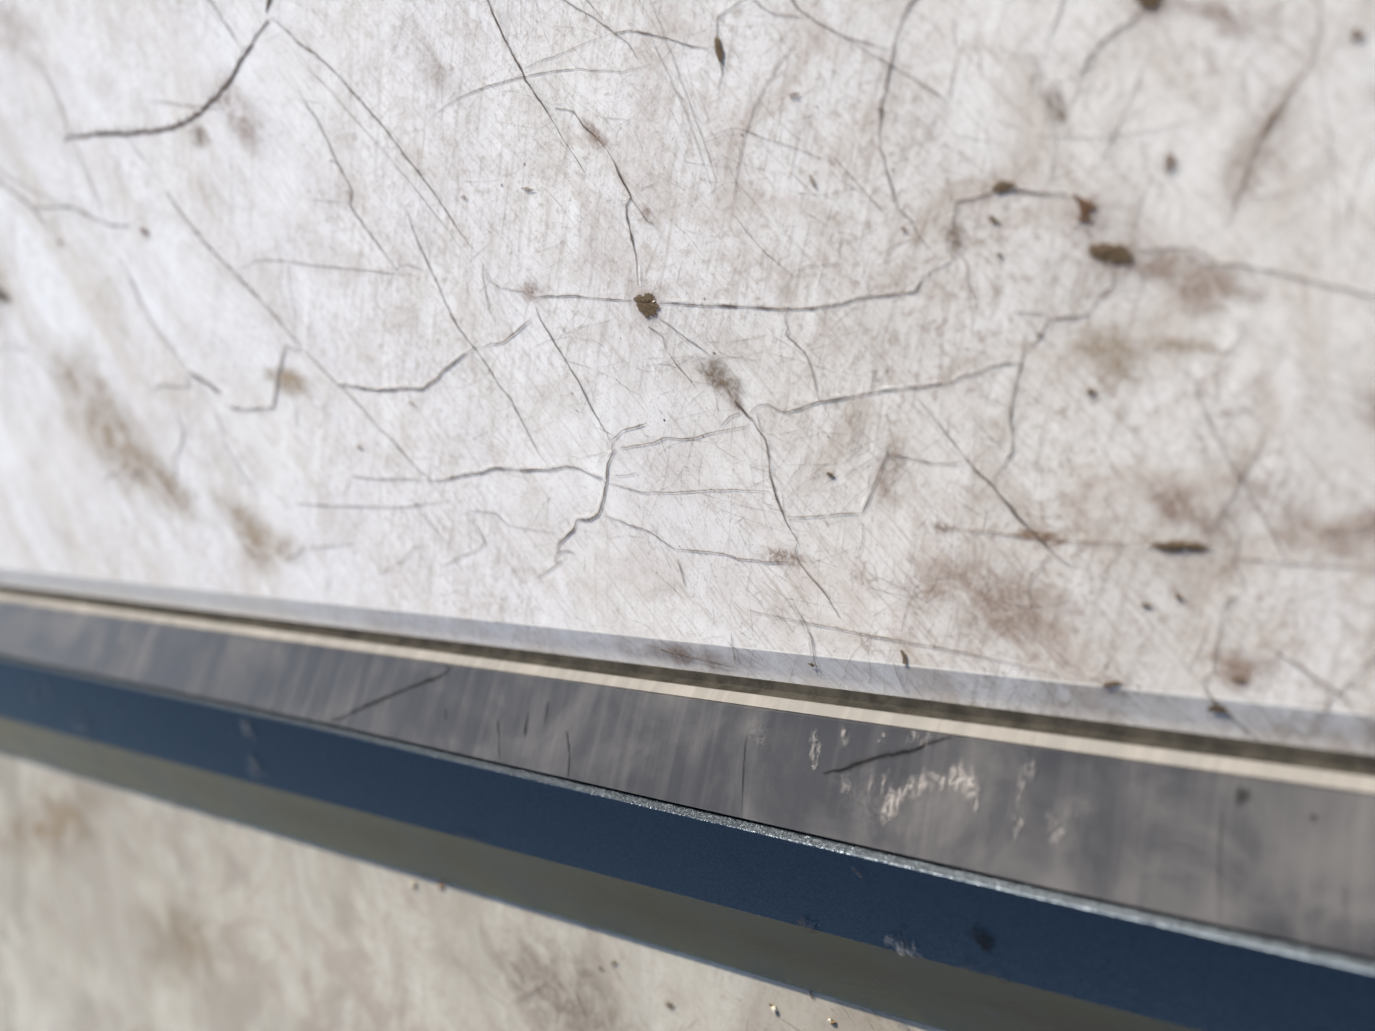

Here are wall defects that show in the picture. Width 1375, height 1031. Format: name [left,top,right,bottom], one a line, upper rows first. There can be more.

crack [155,198,299,410]
crack [41,0,457,228]
crack [306,0,1134,664]
rust [1071,193,1098,224]
crack [1263,109,1278,131]
crack [1203,445,1260,742]